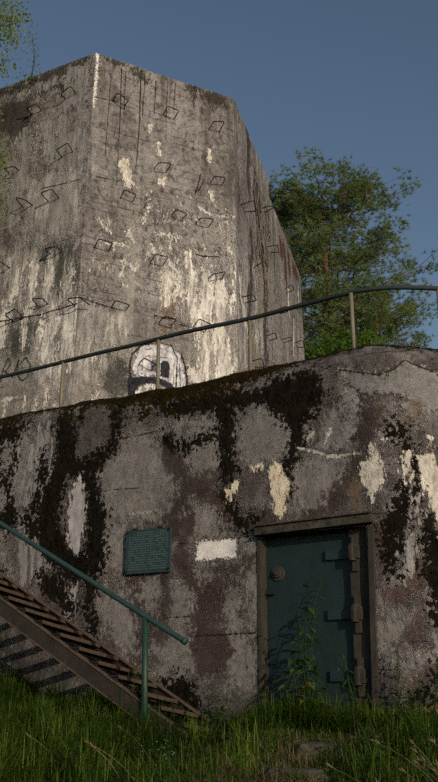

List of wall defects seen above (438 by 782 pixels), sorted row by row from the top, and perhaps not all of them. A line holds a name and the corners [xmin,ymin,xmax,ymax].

water stain [0,53,272,418]
corrosion [279,235,299,287]
spalling [303,359,438,451]
crack [322,360,438,376]
water stain [13,418,56,587]
water stain [64,474,88,555]
peeling [224,480,239,501]
peeling [250,461,290,520]
peeling [356,437,388,504]
peeling [397,435,438,521]
water stain [60,576,78,622]
water stain [374,479,430,646]